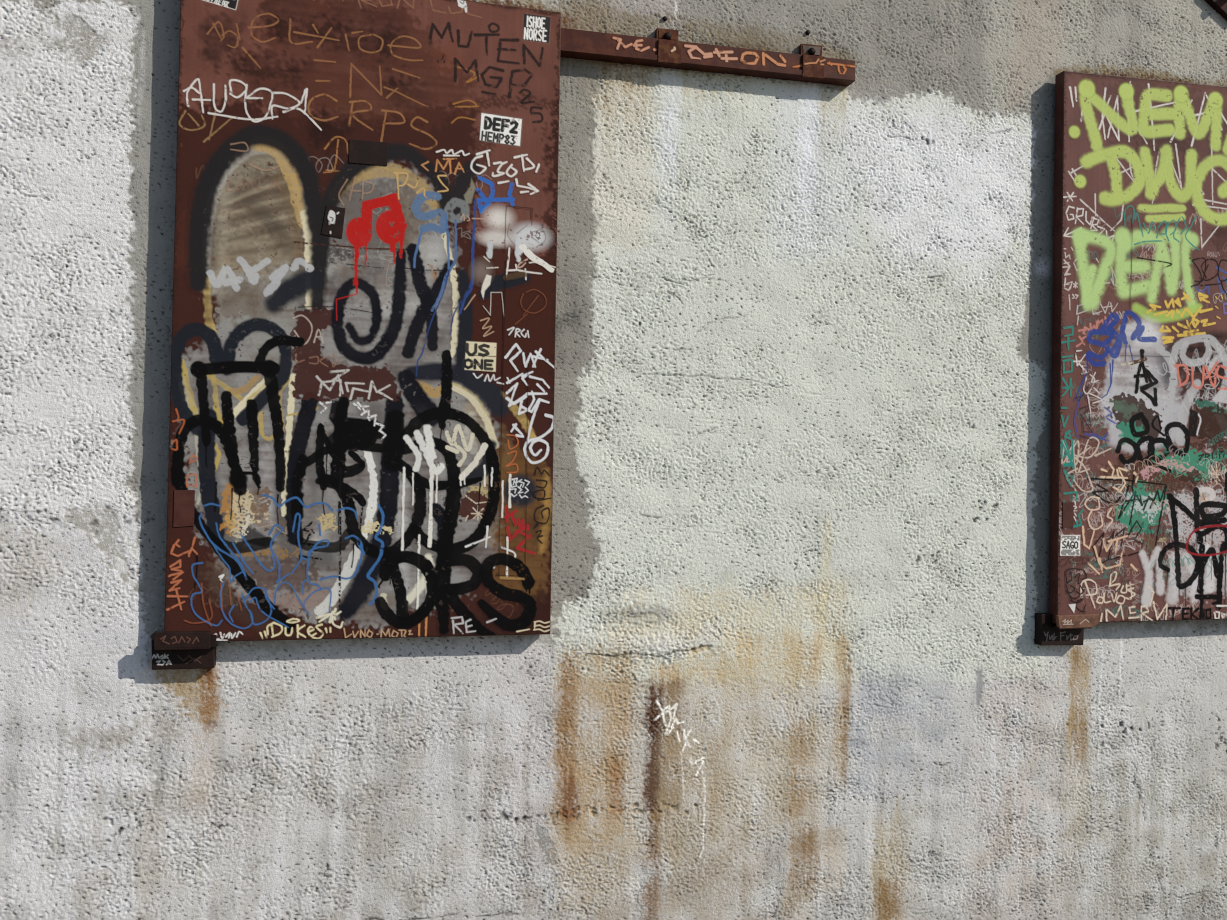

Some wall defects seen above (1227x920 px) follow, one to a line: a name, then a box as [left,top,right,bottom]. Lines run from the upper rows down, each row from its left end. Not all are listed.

rust [560,57,758,177]
rust [465,0,863,73]
rust [811,85,853,179]
rust [139,647,230,864]
rust [538,510,917,920]
rust [1058,643,1096,902]